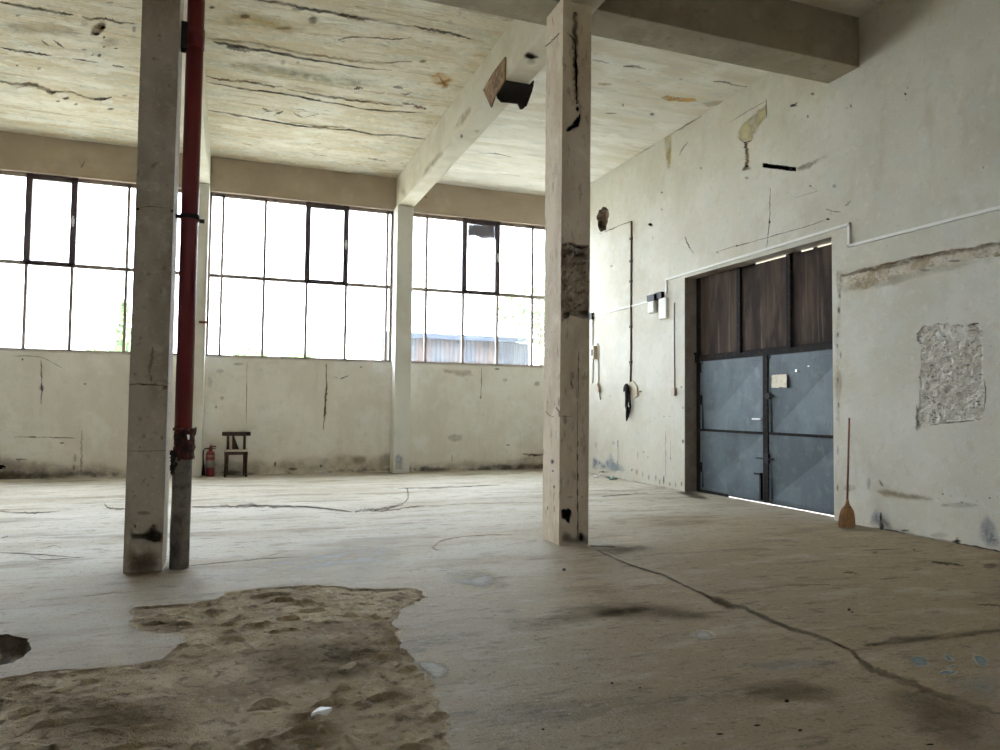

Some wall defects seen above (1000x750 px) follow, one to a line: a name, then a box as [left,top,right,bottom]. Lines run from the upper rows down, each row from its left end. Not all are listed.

crack [1,47,51,56]
crack [0,2,134,24]
crack [213,0,481,71]
crack [545,12,581,132]
crack [207,76,422,139]
spalling [560,242,589,322]
flaking render [838,242,1000,312]
crack [321,364,329,430]
flaking render [916,322,991,431]
crack [192,485,489,512]